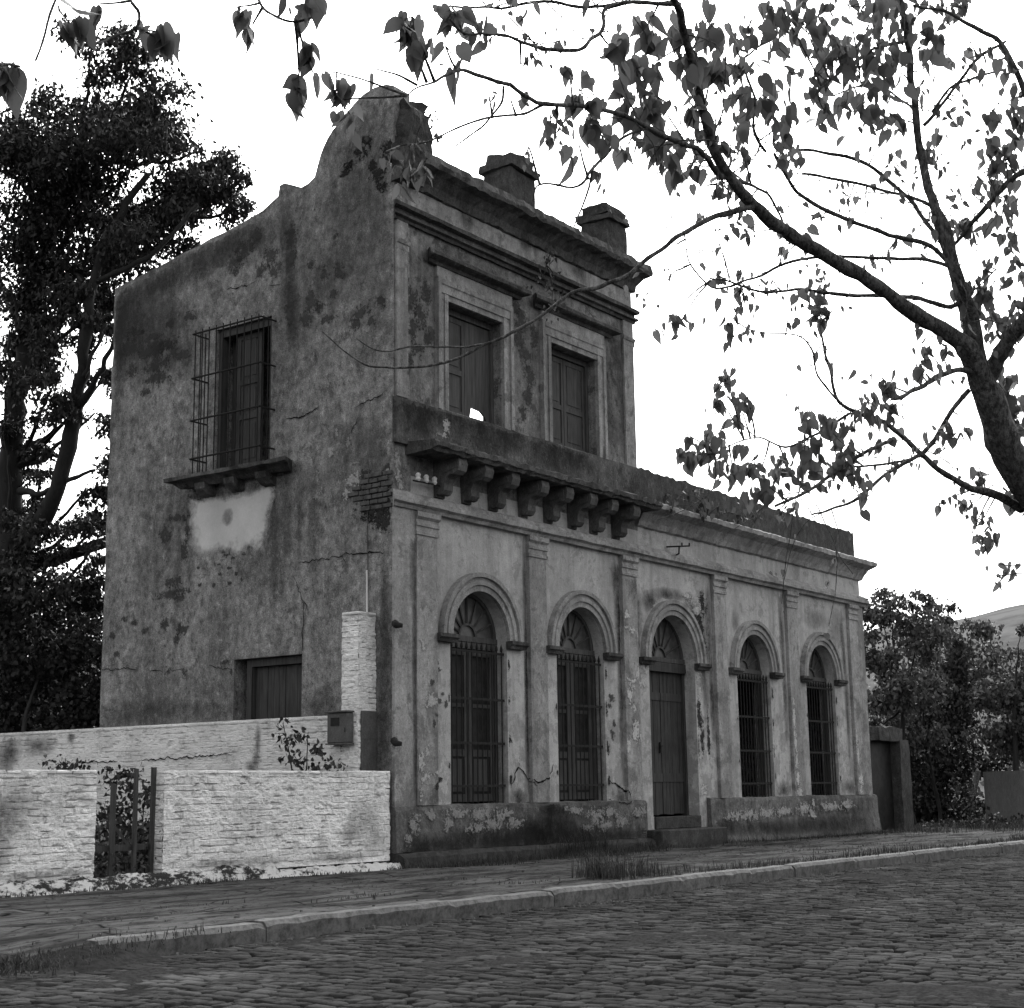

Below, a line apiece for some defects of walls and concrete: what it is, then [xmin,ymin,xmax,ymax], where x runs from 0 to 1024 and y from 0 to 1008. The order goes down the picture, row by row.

spalling [342,440,406,533]
crack [293,551,383,651]
peeling [421,661,450,728]
peeling [404,744,527,848]
crack [512,762,553,786]
peeling [564,805,646,833]
peeling [723,698,864,822]